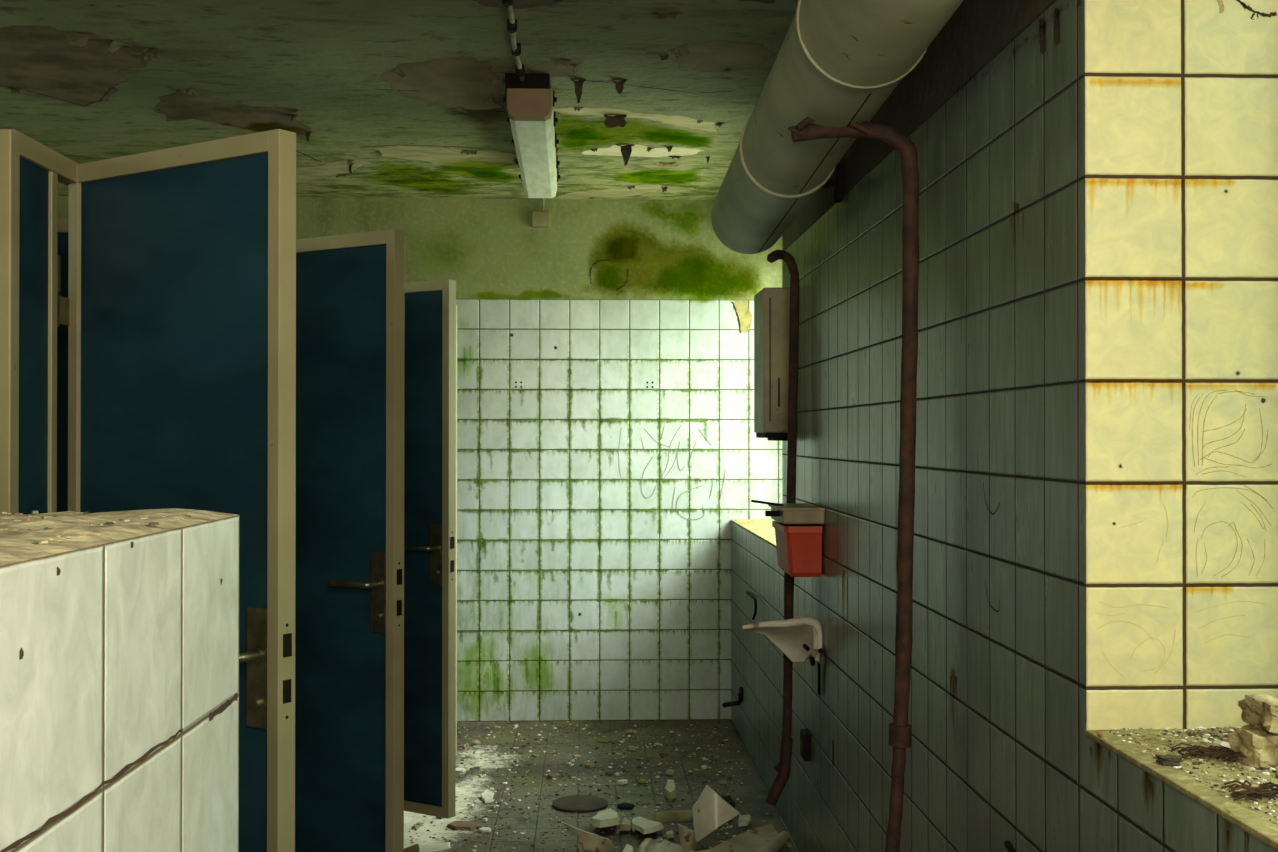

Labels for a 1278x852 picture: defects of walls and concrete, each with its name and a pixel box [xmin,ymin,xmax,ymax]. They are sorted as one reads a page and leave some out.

peeling [0,26,161,106]
peeling [155,88,313,142]
peeling [553,80,728,133]
peeling [296,146,518,184]
peeling [554,184,668,199]
peeling [582,144,710,167]